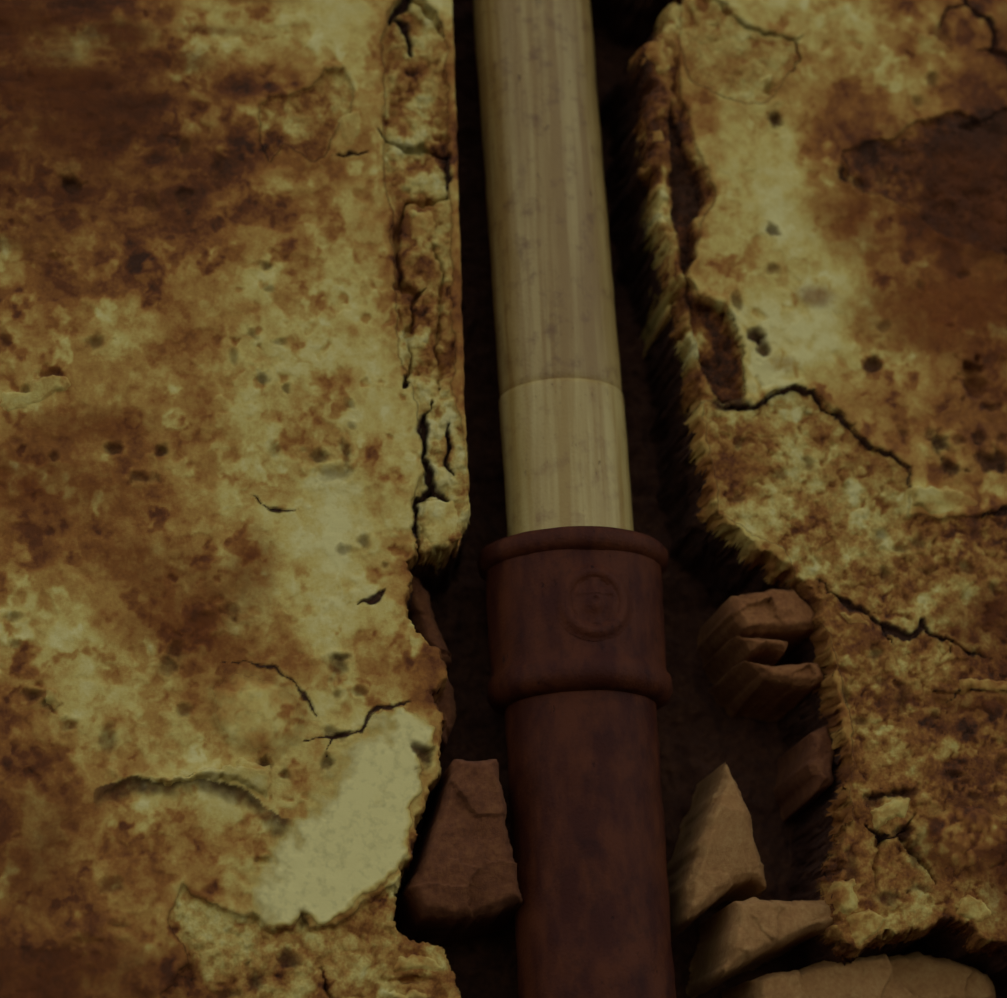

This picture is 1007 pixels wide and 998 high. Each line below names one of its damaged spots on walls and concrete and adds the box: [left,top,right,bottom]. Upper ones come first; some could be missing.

crack [939,0,1007,65]
spalling [381,0,471,570]
crack [717,384,911,488]
spalling [629,0,1007,958]
crack [982,506,1007,517]
crack [819,579,986,658]
crack [222,660,411,757]
spalling [160,884,461,998]